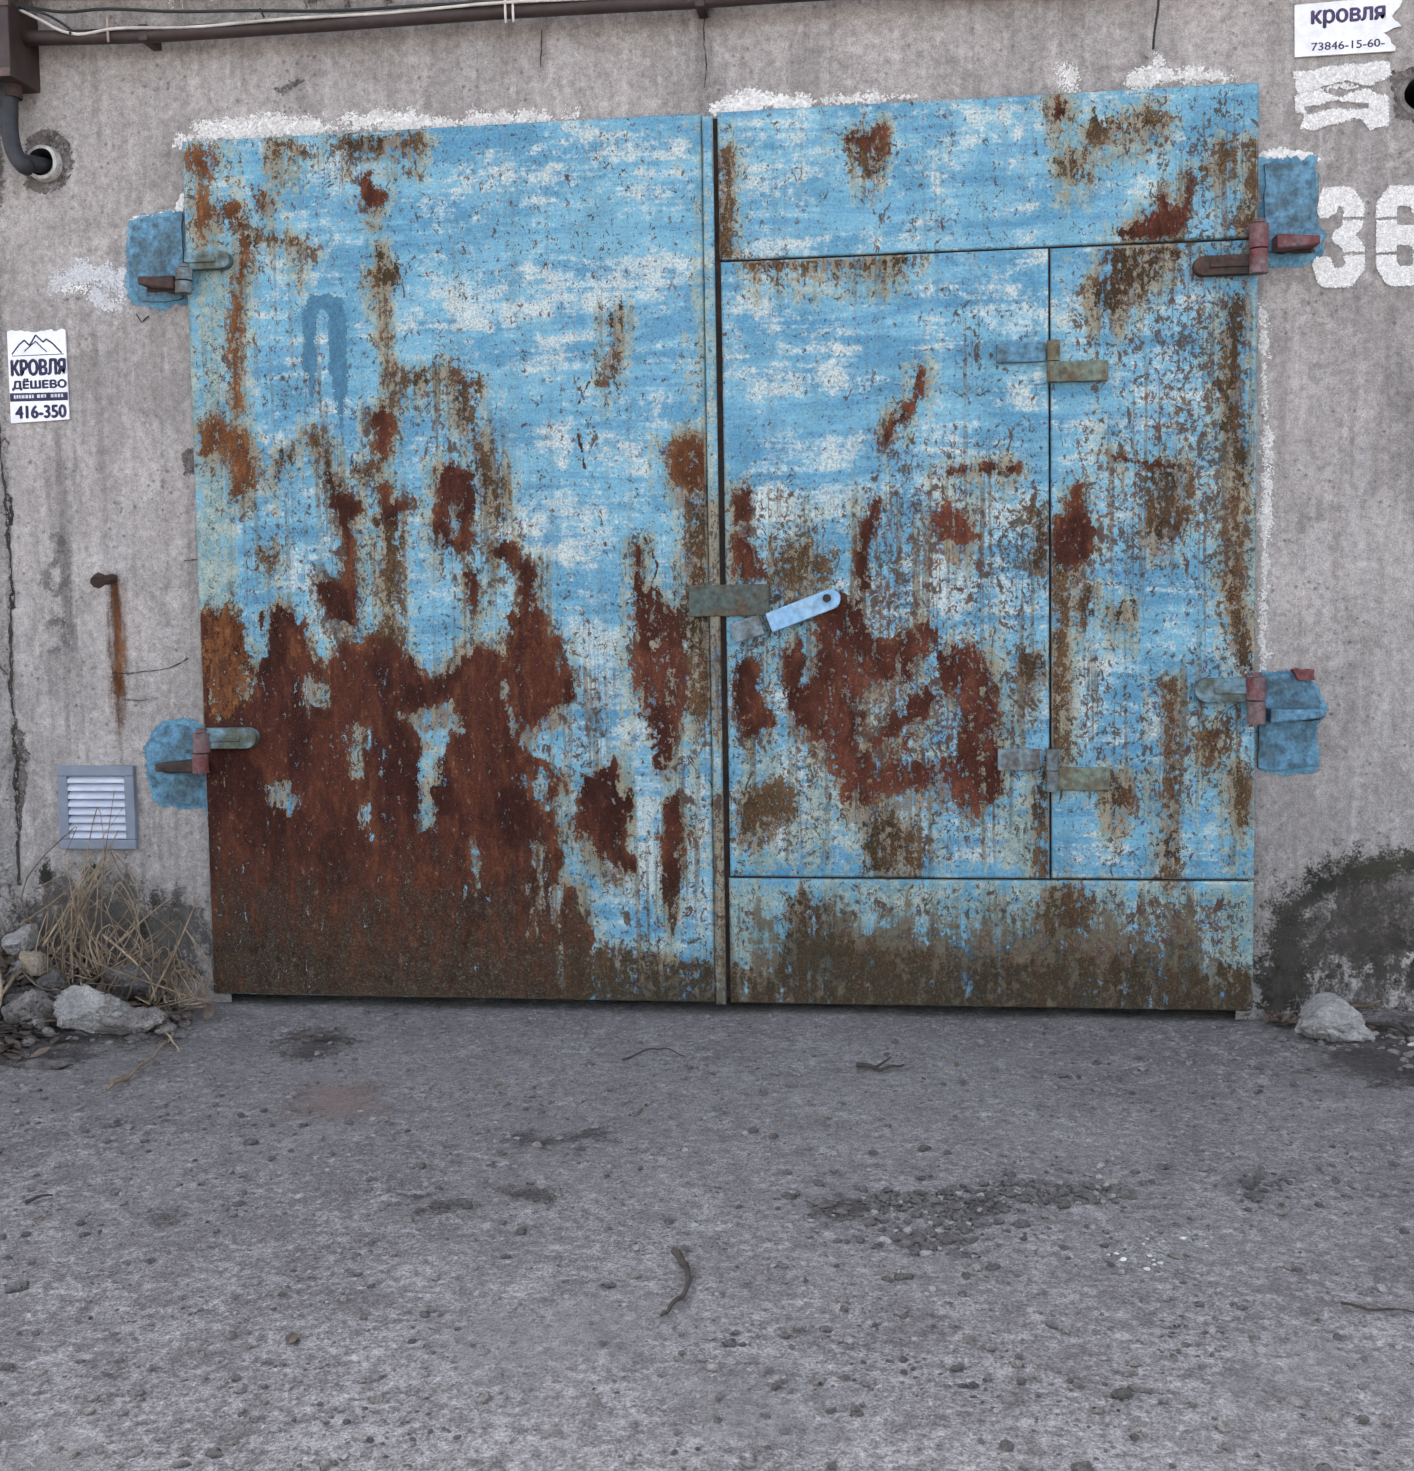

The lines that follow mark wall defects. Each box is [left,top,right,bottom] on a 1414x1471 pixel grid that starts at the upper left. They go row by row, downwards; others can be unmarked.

rust [719,145,924,282]
rust [844,122,892,187]
rust [1070,129,1256,324]
crack [0,427,22,886]
rust [108,575,127,728]
rust [184,131,713,1001]
rust [873,364,928,447]
rust [927,459,1025,553]
rust [730,478,1252,1010]
rust [1111,292,1254,678]
damp [1247,840,1414,1019]